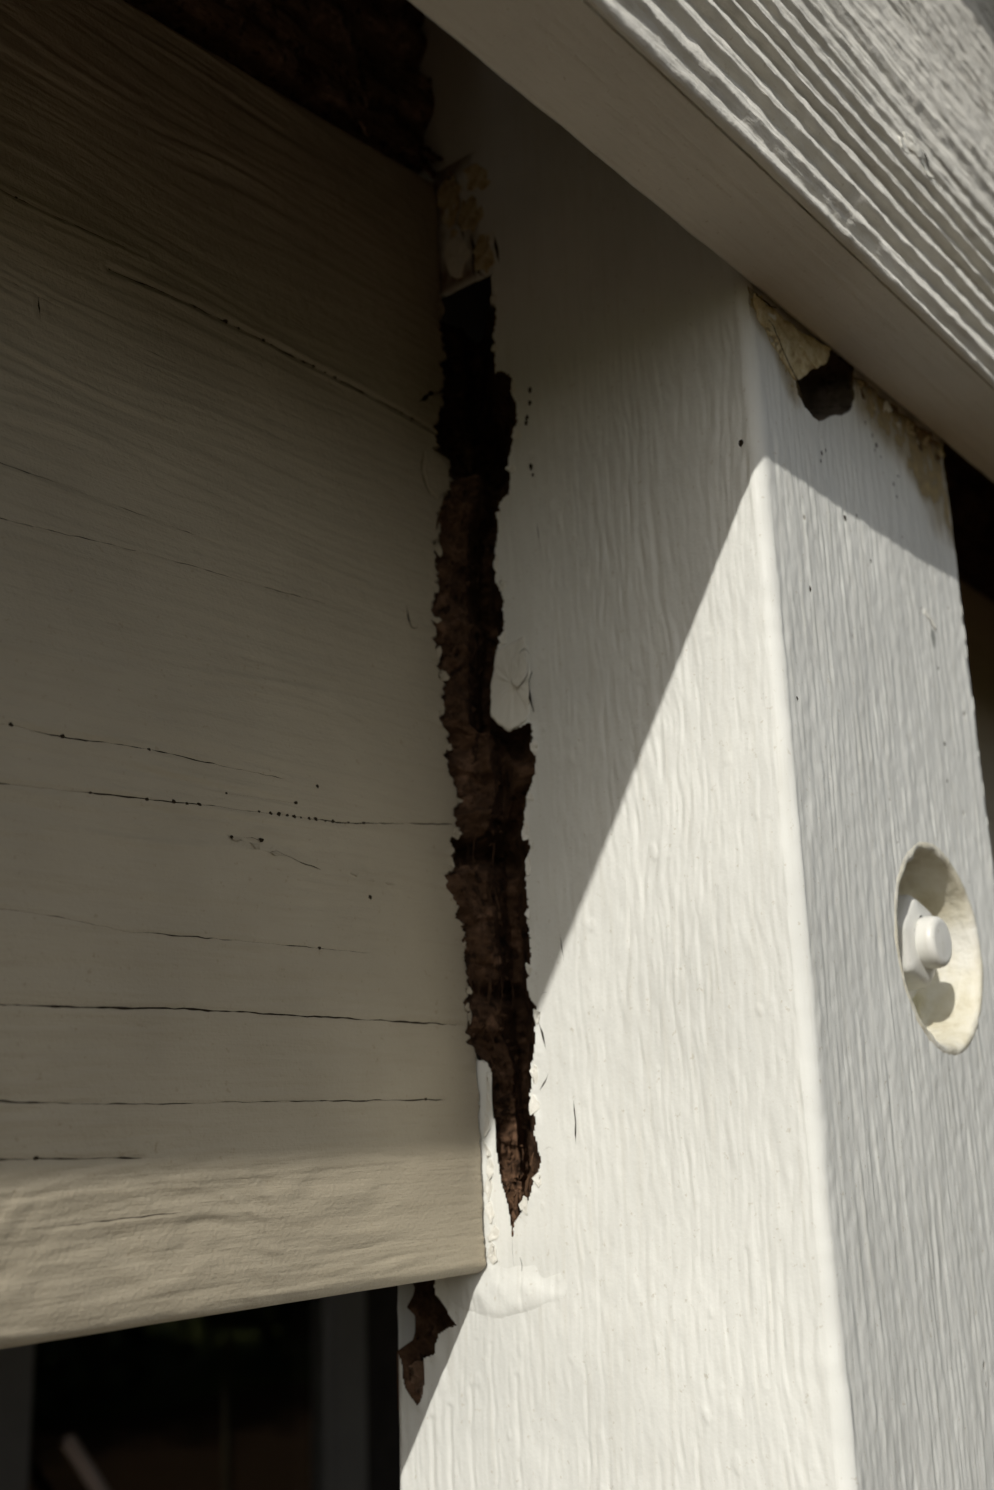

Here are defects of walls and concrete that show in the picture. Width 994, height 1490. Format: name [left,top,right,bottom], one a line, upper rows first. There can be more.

spalling [753,292,946,462]